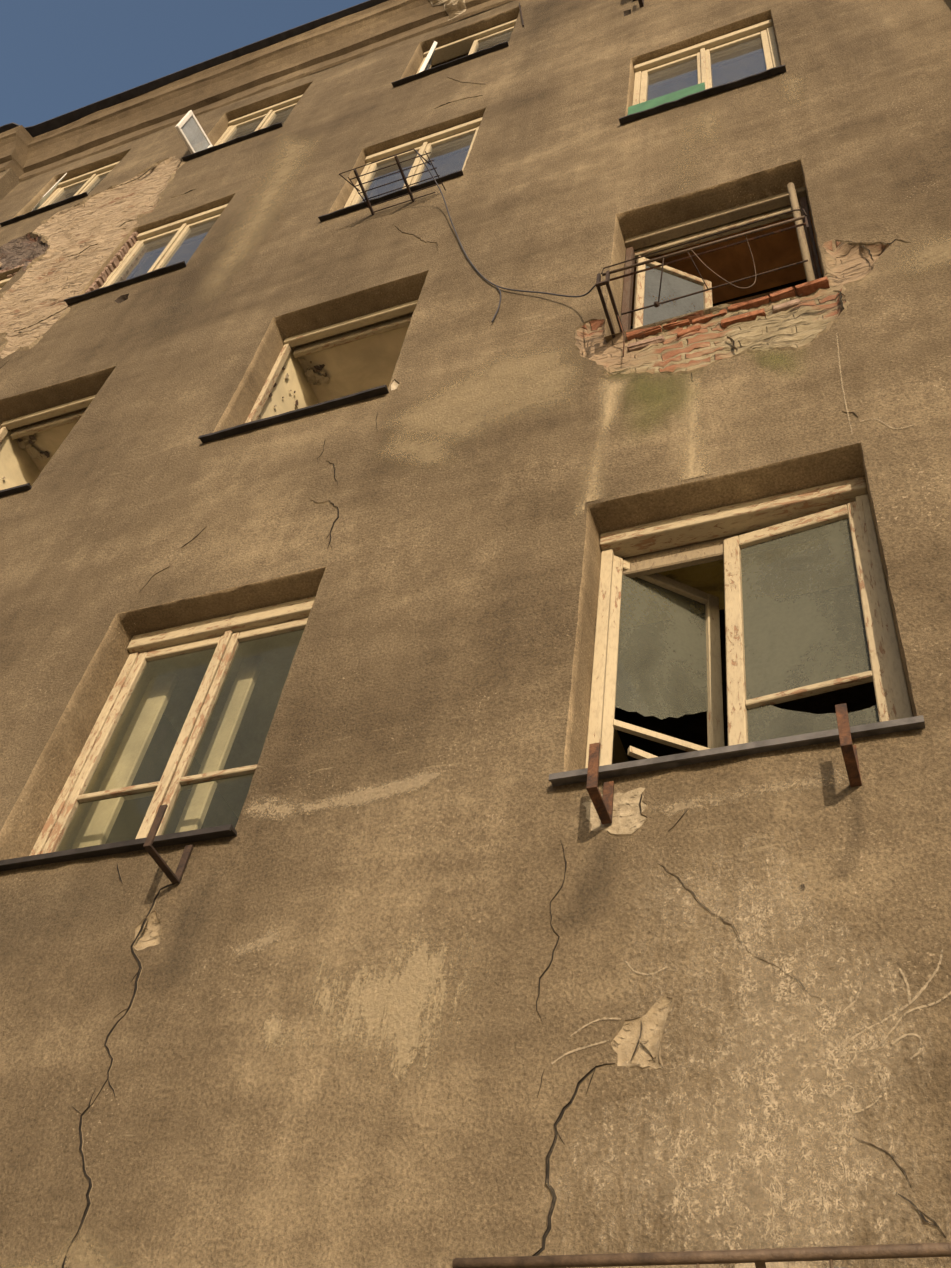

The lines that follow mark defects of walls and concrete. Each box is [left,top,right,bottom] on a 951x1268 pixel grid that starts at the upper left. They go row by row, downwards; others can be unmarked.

peeling [0,156,187,359]
spalling [573,239,890,380]
crack [311,439,339,550]
peeling [582,771,847,837]
crack [536,839,567,1023]
crack [658,864,832,1011]
crack [62,874,184,1268]
crack [532,1021,653,1256]
crack [850,1135,946,1238]